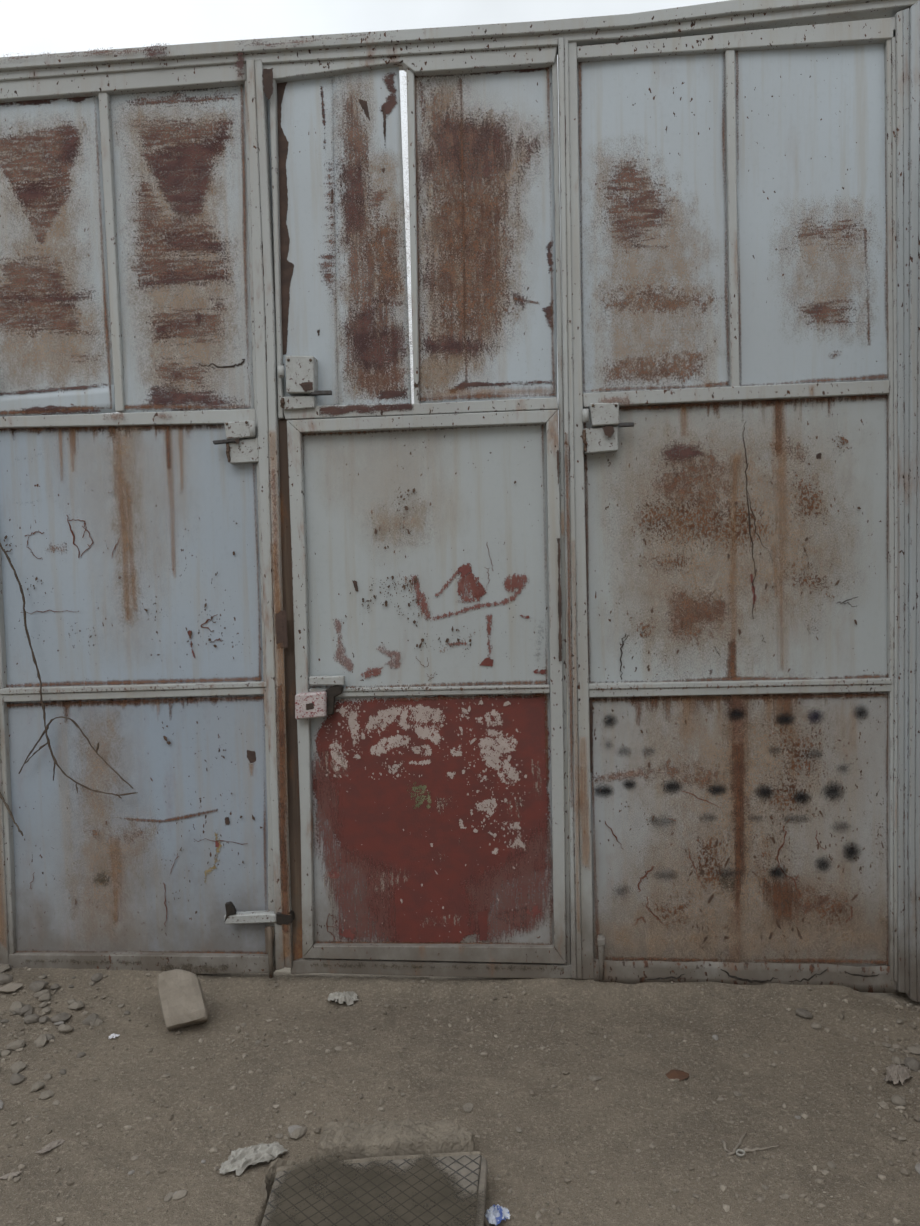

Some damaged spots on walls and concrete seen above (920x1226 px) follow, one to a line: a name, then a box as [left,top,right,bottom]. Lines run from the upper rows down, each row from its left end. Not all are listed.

corrosion [0,84,249,561]
corrosion [5,456,289,950]
corrosion [302,426,490,442]
corrosion [310,660,548,780]
peeling [318,698,542,883]
corrosion [319,67,556,417]
corrosion [722,51,739,172]
corrosion [583,158,889,965]